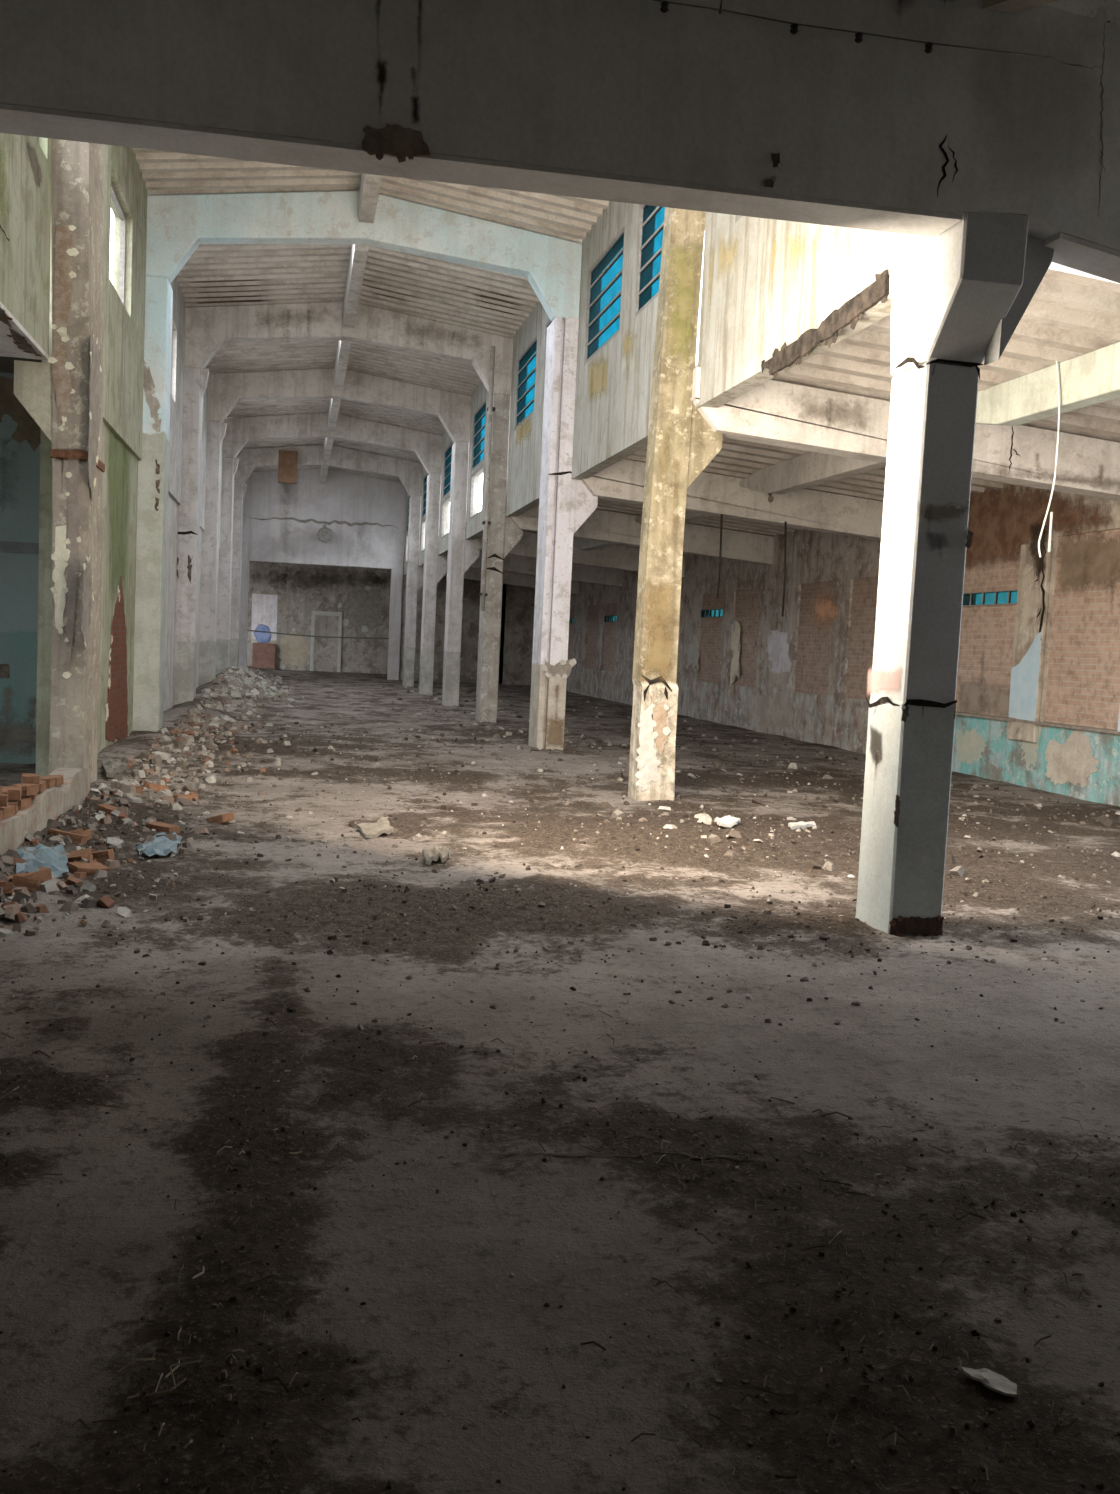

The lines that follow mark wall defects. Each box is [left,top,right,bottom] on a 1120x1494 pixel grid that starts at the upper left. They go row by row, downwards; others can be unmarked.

spalling [361,123,430,163]
crack [937,135,958,197]
spalling [761,269,890,379]
crack [641,675,672,701]
crack [865,696,957,719]
peeling [955,728,986,764]
peeling [1018,719,1100,790]